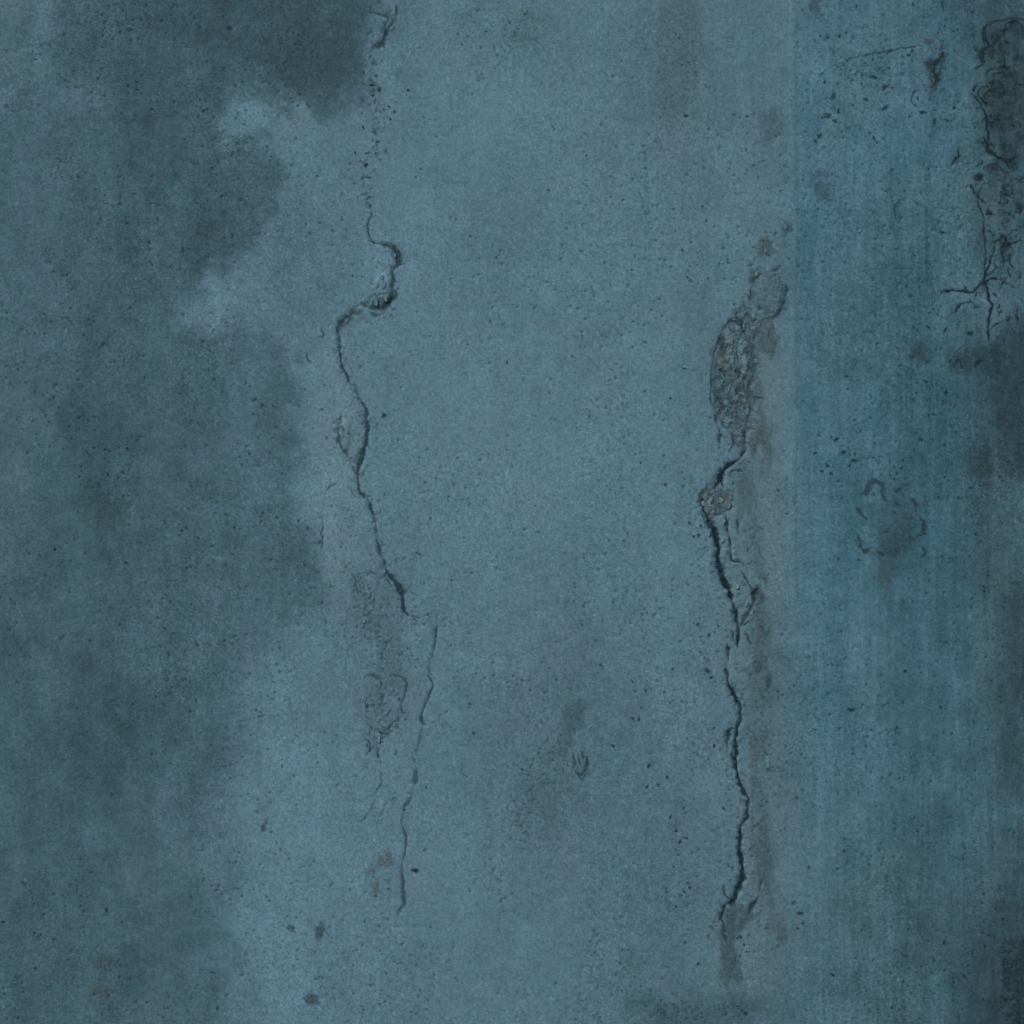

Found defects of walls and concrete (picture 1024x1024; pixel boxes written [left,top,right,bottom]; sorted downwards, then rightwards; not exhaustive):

crack [306,205,438,744]
crack [398,770,417,913]
crack [701,437,761,941]
spalling [710,305,757,454]